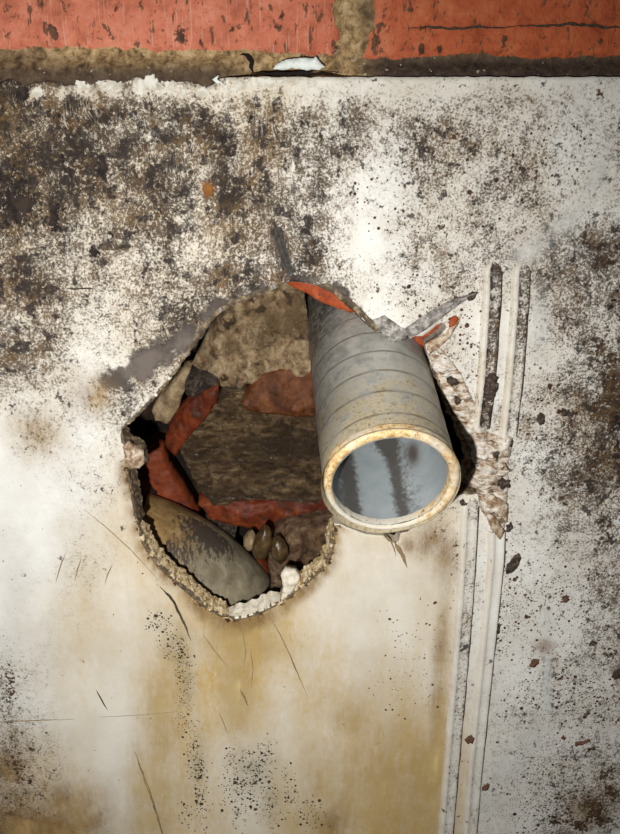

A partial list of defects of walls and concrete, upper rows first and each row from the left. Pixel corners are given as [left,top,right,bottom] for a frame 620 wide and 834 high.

crack [421,22,620,30]
peeling [30,86,45,99]
peeling [75,80,122,94]
peeling [131,57,324,99]
corrosion [202,182,214,197]
spalling [317,283,382,334]
spalling [120,224,341,625]
spalling [427,347,513,539]
crack [160,587,191,640]
damp [0,663,94,834]
damp [146,612,326,834]